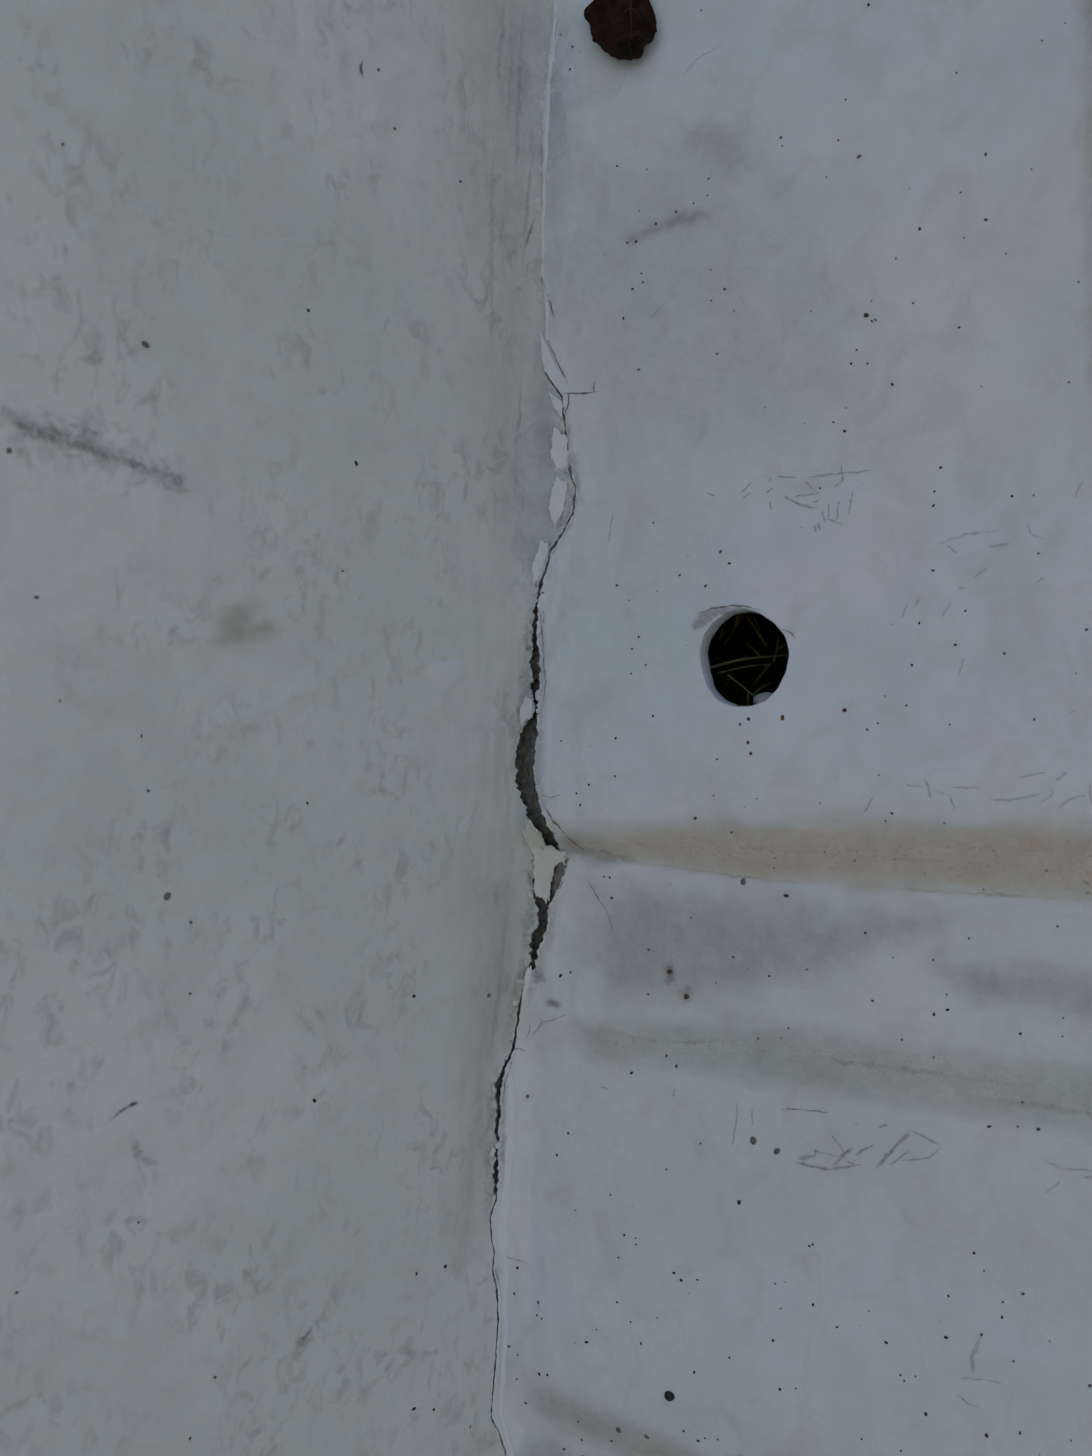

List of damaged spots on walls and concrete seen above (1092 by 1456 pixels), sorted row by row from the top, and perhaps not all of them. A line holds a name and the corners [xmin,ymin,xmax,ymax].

crack [489,294,610,1456]
spalling [552,859,568,893]